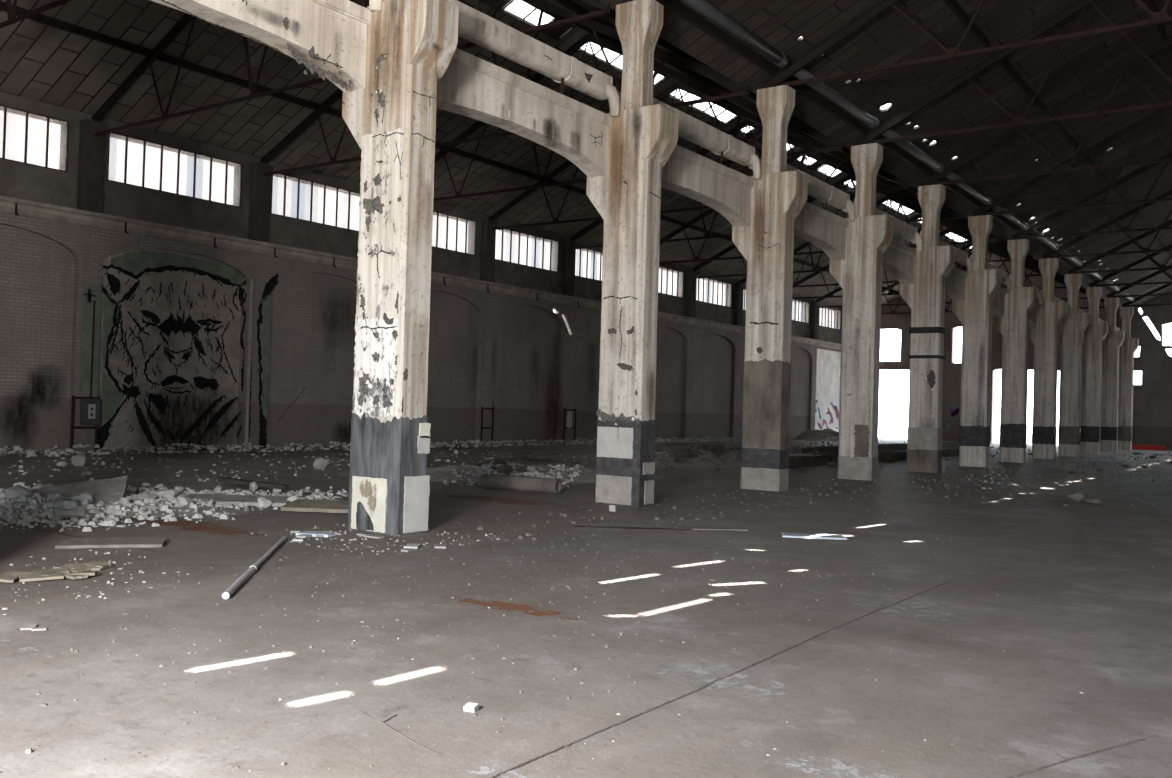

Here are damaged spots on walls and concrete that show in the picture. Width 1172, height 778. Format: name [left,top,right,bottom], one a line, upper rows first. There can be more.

peeling [359,159,402,247]
peeling [352,287,409,413]
corrosion [438,594,589,620]